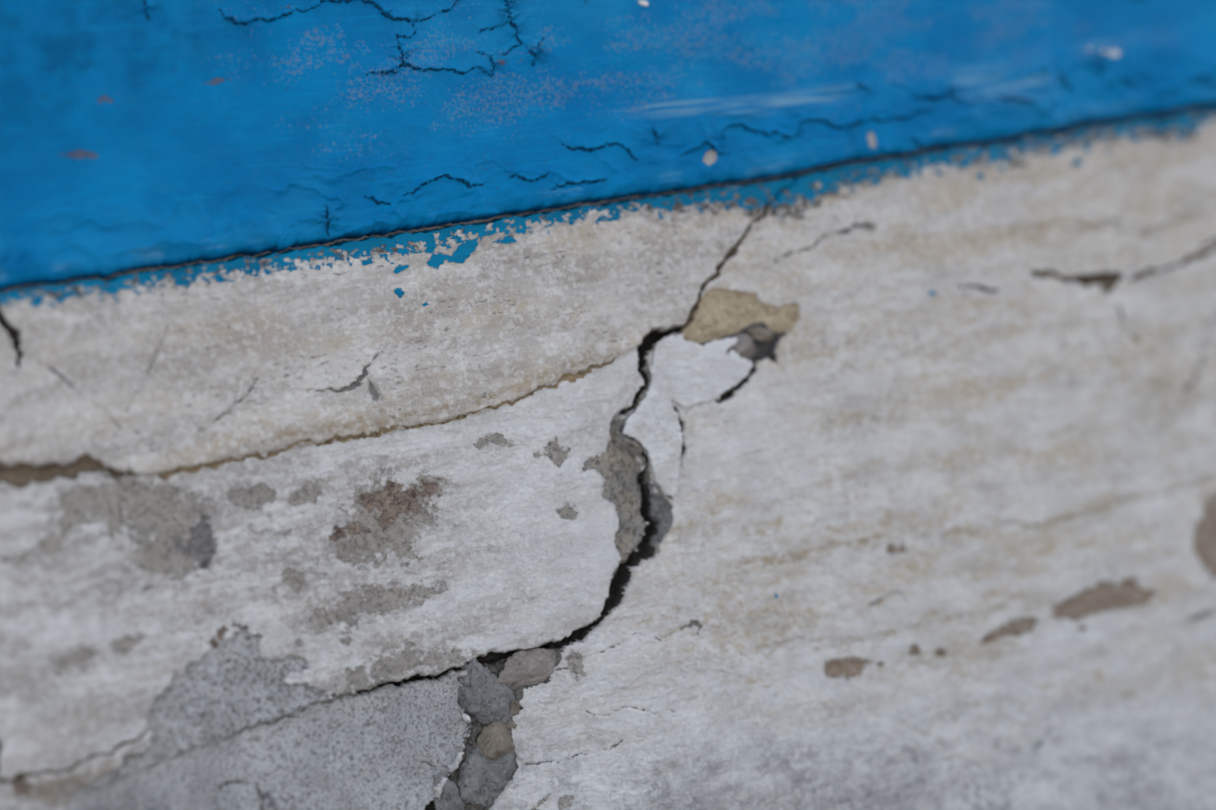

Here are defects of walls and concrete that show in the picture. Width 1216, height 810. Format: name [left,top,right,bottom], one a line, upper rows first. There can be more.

crack [219,0,544,77]
crack [364,77,1034,206]
spalling [682,288,801,364]
crack [1030,247,1216,343]
crack [0,176,797,740]
peeling [1193,496,1216,579]
peeling [64,467,586,810]
peeling [824,657,884,680]
peeling [983,617,1038,644]
peeling [1052,577,1159,631]
crack [525,740,623,765]
crack [425,798,438,810]